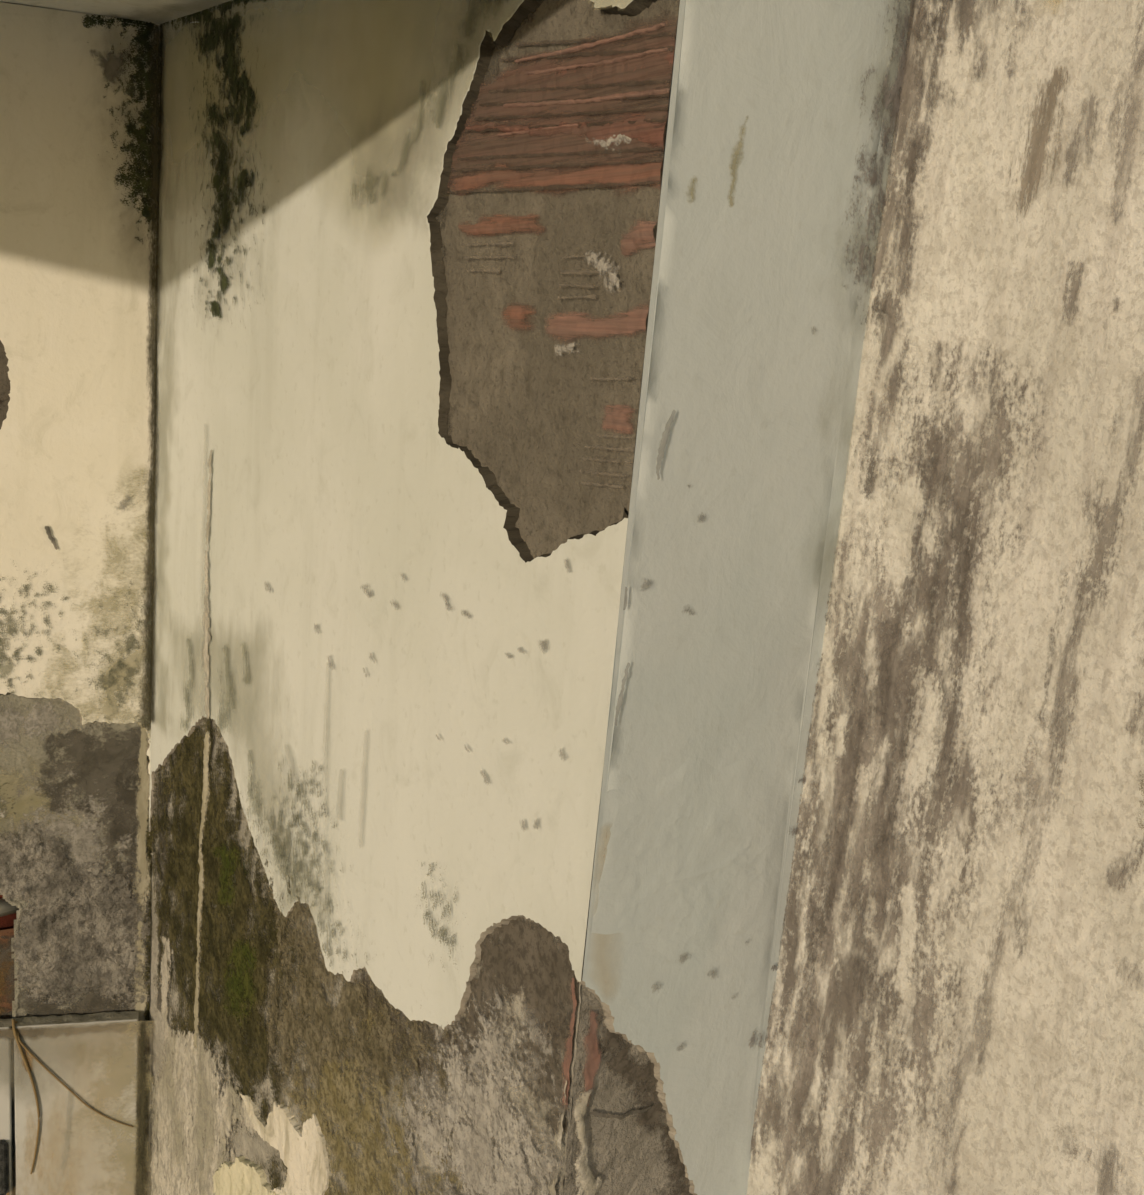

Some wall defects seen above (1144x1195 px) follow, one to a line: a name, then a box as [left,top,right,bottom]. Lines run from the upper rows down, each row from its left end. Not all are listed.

flaking render [0,340,10,429]
water stain [0,546,173,1195]
water stain [82,0,425,332]
flaking render [0,692,697,1195]
flaking render [427,0,680,571]
water stain [749,0,1144,1195]